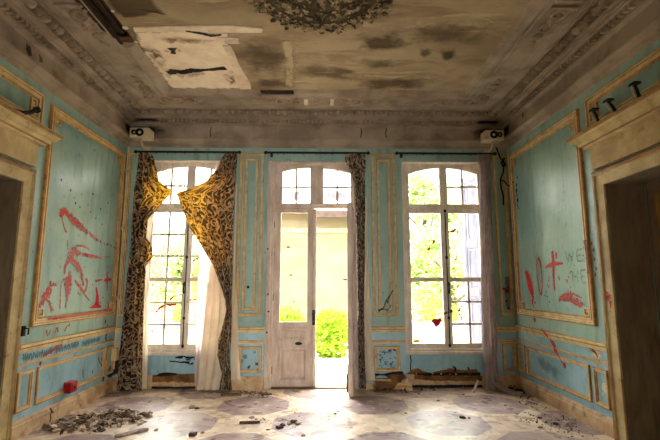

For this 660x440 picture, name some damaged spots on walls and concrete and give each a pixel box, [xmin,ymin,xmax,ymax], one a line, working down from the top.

flaking render [75,0,263,89]
leakage [366,35,401,49]
flaking render [373,349,406,388]
flaking render [412,372,482,388]